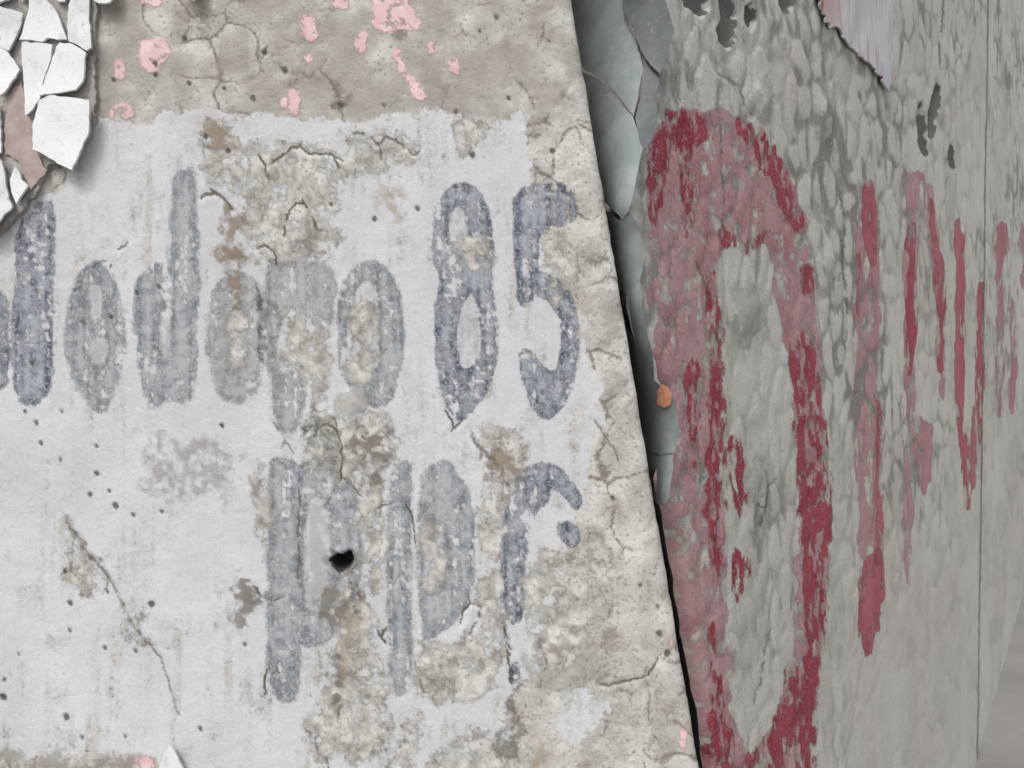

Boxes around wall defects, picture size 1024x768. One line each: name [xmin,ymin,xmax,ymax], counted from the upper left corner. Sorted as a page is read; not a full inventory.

spalling [683,0,757,48]
spalling [779,0,795,14]
peeling [0,0,114,237]
spalling [916,83,941,156]
crack [258,141,344,179]
crack [200,187,233,210]
crack [256,199,328,265]
peeling [571,0,679,505]
peeling [272,299,528,768]
crack [67,523,178,712]